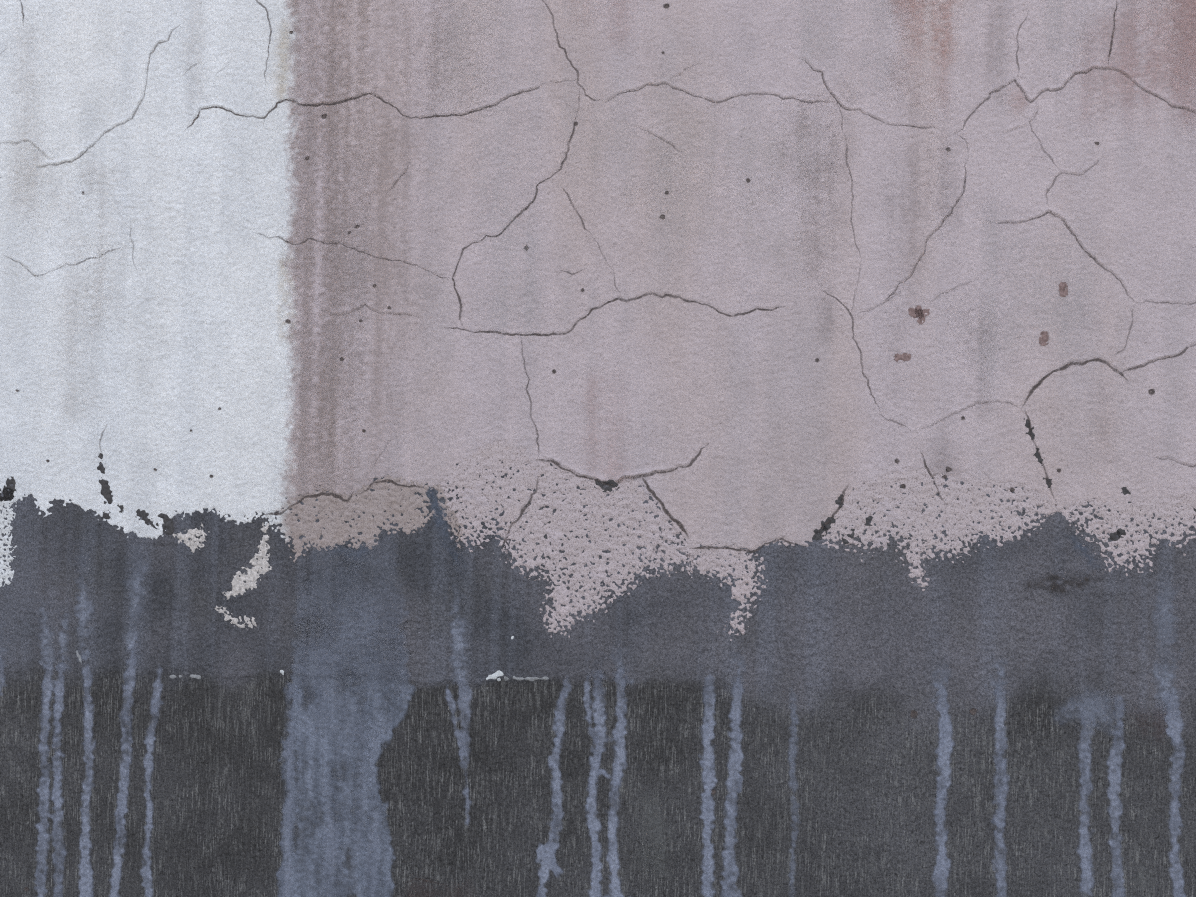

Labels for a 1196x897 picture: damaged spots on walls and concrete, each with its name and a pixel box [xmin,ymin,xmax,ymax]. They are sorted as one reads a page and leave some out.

crack [189,88,537,127]
crack [452,30,778,336]
crack [1026,349,1186,431]
spalling [0,476,17,587]
spalling [96,453,174,535]
spalling [261,439,795,641]
crack [640,448,792,553]
spalling [812,418,1196,591]
leakage [35,583,95,897]
leakage [276,658,414,897]
leakage [537,662,632,897]
leakage [700,662,743,897]